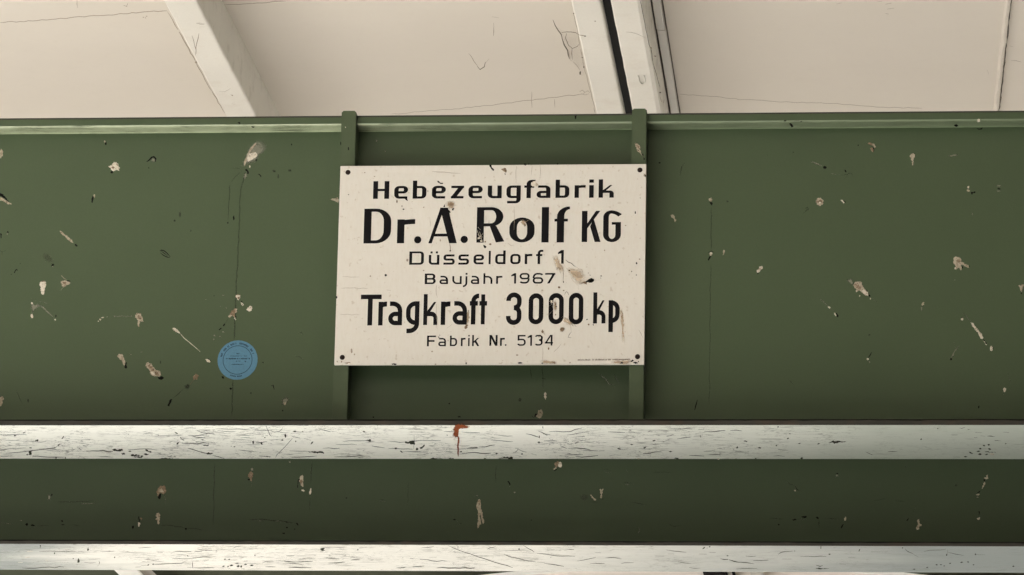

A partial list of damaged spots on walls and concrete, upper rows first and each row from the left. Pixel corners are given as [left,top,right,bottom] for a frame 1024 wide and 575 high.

crack [394,13,596,114]
peeling [244,143,261,177]
peeling [953,257,970,281]
peeling [848,279,871,299]
peeling [146,361,164,380]
corrosion [453,424,468,456]
peeling [476,495,484,528]